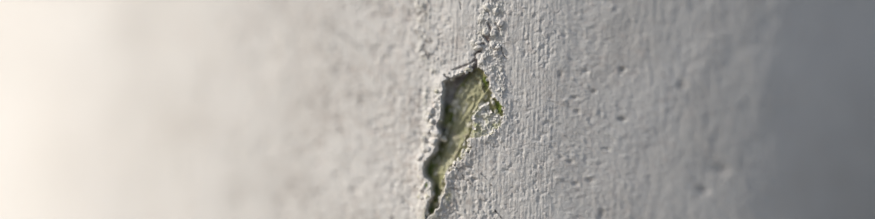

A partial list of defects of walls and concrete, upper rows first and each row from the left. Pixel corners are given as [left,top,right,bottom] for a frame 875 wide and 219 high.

peeling [416,65,505,217]